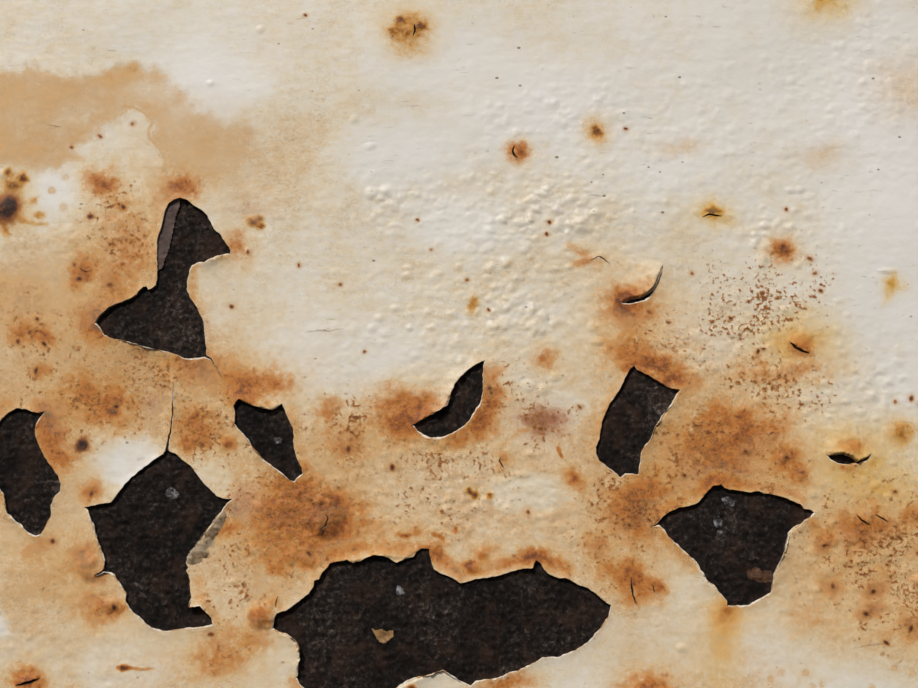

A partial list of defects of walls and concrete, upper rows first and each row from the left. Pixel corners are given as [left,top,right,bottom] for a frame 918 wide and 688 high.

leakage [0,62,248,176]
peeling [95,197,230,364]
peeling [0,408,61,537]
peeling [84,383,233,632]
peeling [233,399,303,482]
peeling [412,360,485,440]
corrosion [0,166,918,677]
peeling [596,365,681,478]
peeling [653,484,815,607]
corrosion [10,665,48,688]
peeling [271,548,611,688]
corrosion [478,671,533,688]